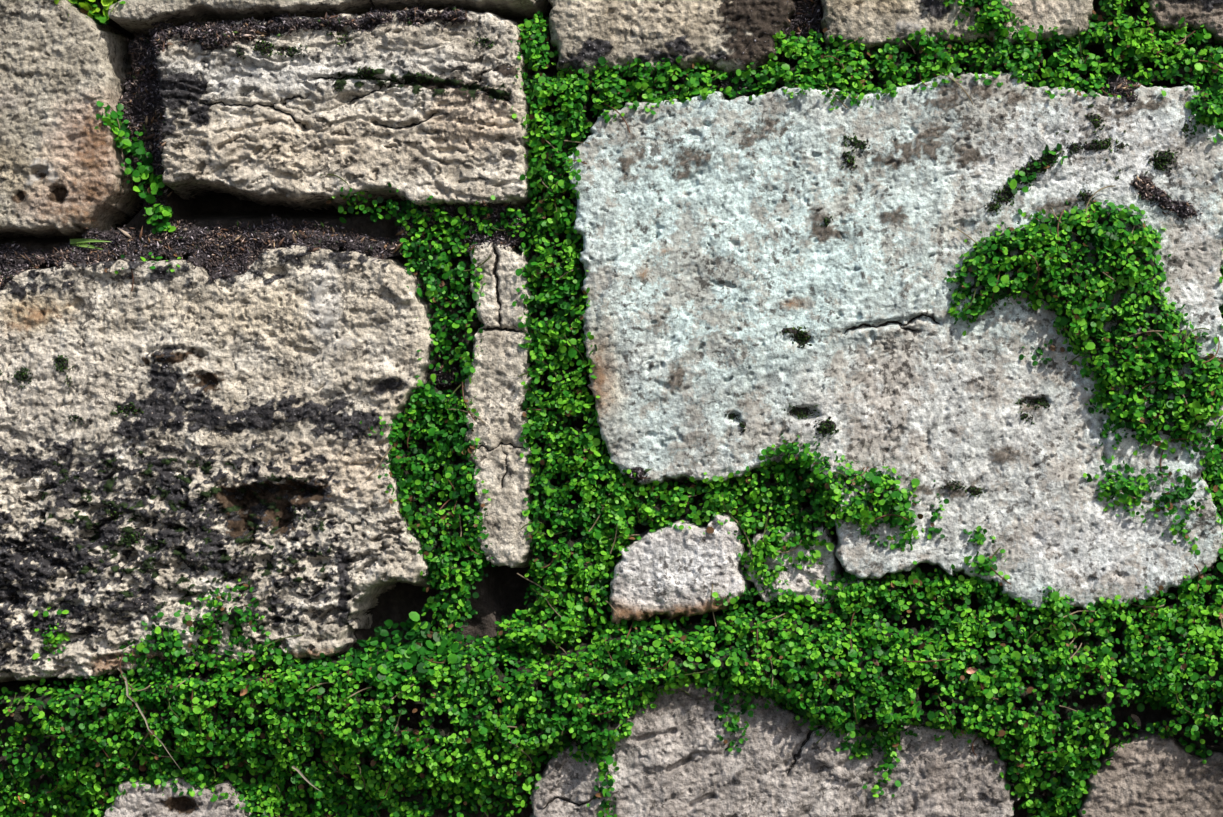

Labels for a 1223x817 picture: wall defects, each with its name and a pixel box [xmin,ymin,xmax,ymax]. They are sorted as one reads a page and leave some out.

crack [844,313,939,334]